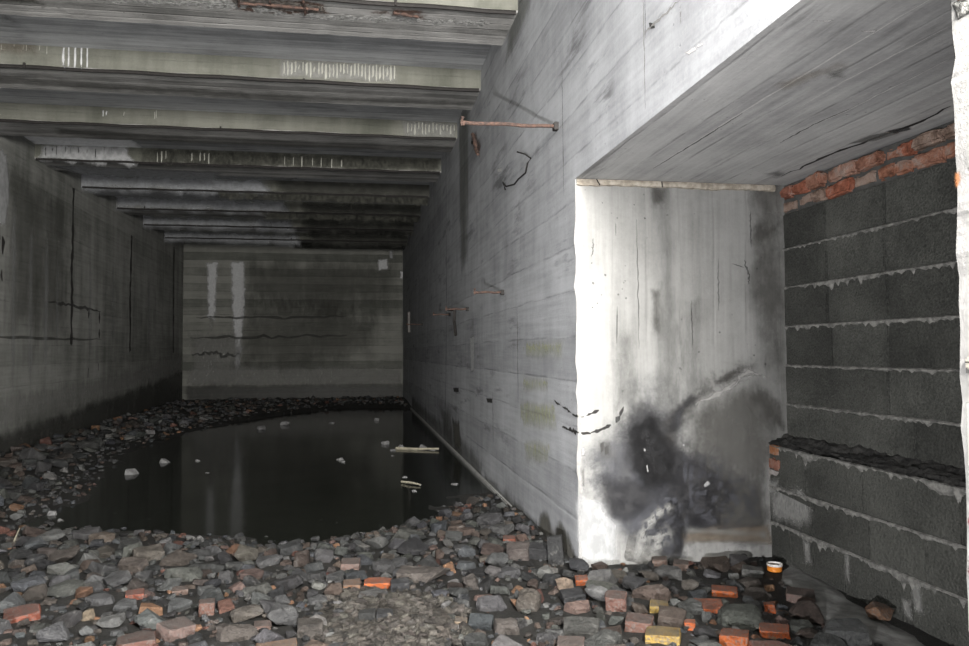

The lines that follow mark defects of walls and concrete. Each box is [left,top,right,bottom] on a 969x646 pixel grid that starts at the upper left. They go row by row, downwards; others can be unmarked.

crack [654,114,741,168]
crack [775,106,951,176]
crack [0,188,101,345]
crack [554,400,624,435]